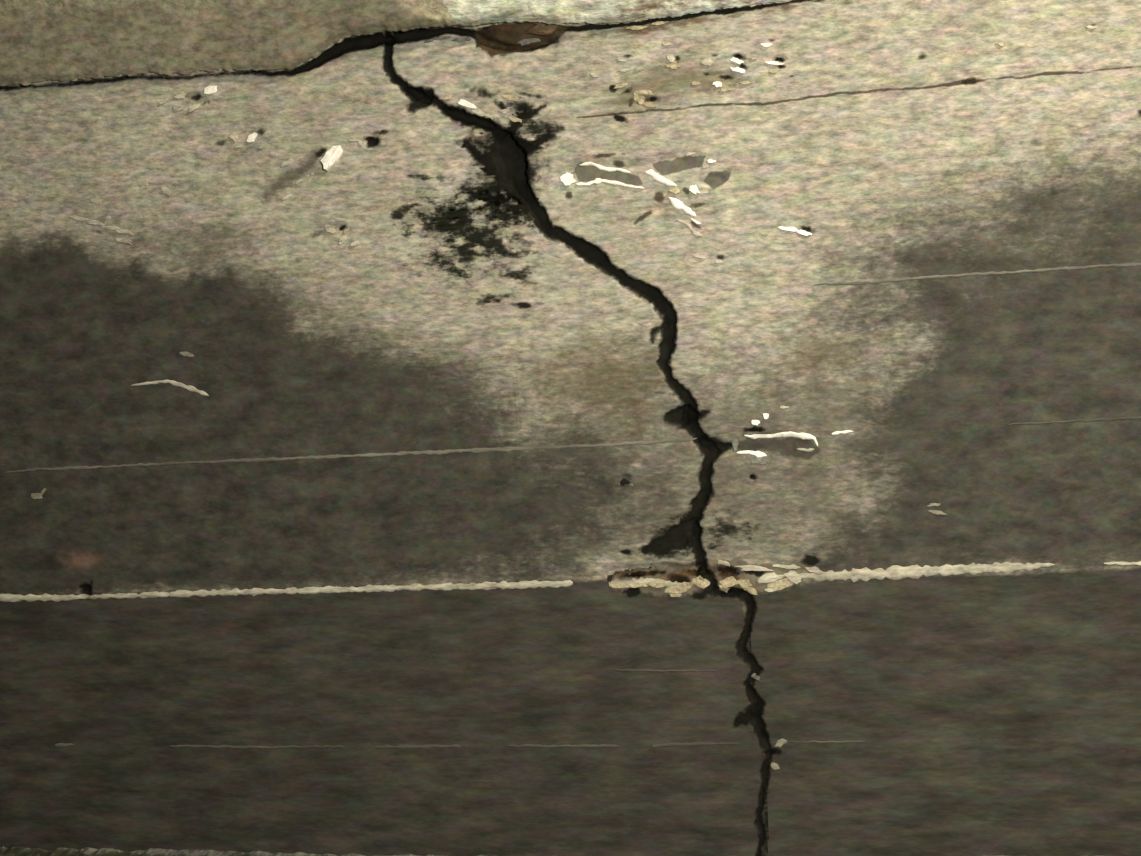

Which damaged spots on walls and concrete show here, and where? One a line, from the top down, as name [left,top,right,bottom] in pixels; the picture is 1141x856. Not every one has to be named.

crack [522,0,823,52]
damp [506,97,557,166]
crack [577,67,1130,118]
damp [391,163,537,280]
peeling [560,152,731,237]
peeling [760,226,812,236]
crack [0,25,772,856]
spalling [731,406,819,480]
damp [0,237,768,856]
spalling [609,555,823,598]
damp [708,456,845,549]
damp [746,171,1141,856]